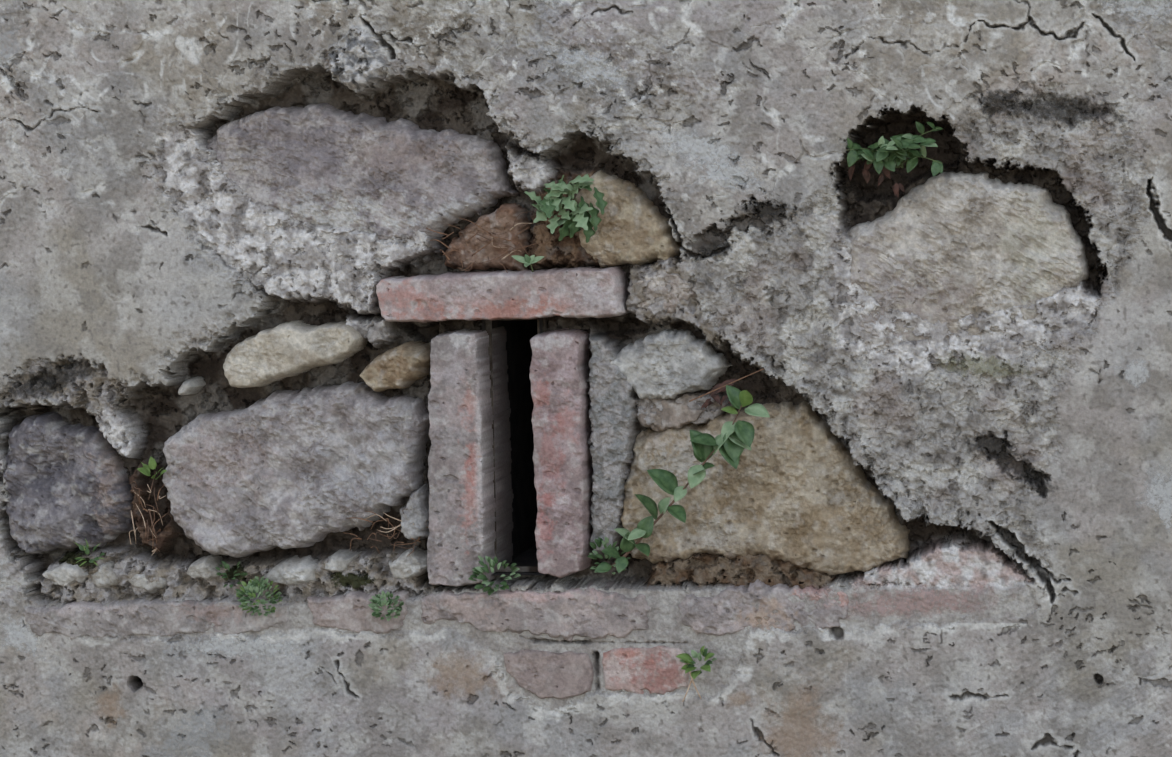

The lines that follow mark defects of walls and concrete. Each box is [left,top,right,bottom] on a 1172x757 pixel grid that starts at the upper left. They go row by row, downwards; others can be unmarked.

crack [844,0,1137,61]
crack [1147,176,1172,243]
flaking render [488,77,1162,636]
flaking render [0,65,831,719]
spalling [948,691,1010,704]
spalling [1032,733,1083,757]